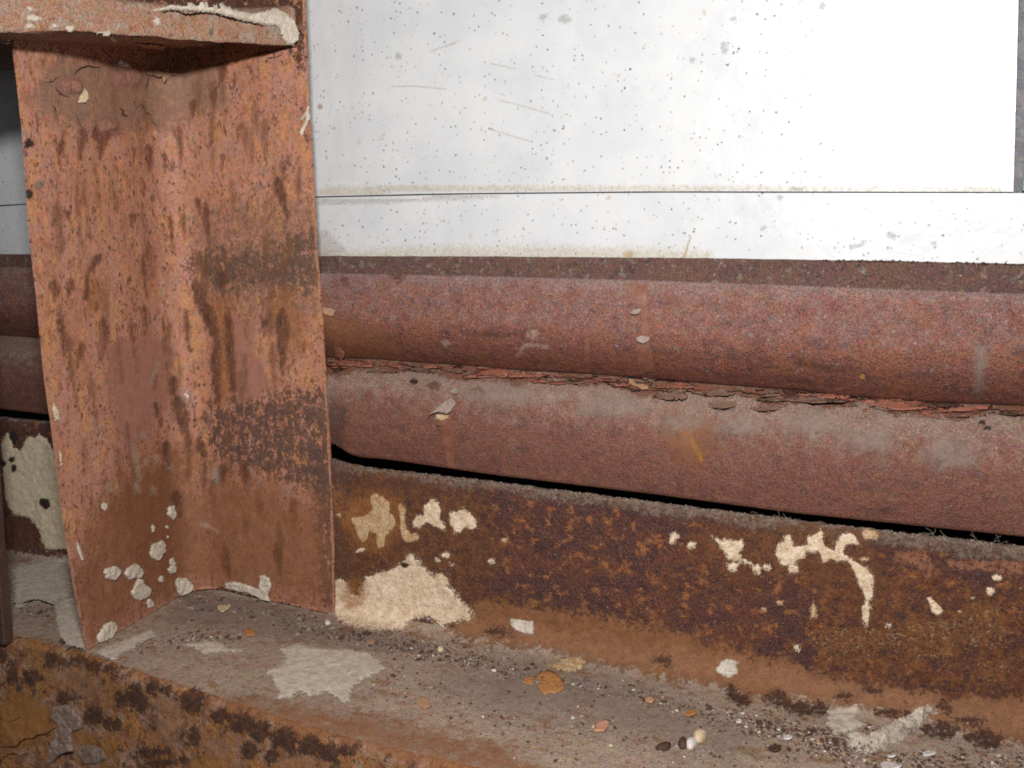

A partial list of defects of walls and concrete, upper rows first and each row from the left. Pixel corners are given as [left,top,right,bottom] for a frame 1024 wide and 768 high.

rust [79,127,111,159]
rust [274,176,300,216]
rust [52,254,101,300]
peeling [409,368,562,421]
peeling [807,392,928,411]
peeling [1,431,67,550]
rust [75,200,1024,753]
rust [3,511,40,552]
peeling [669,531,697,550]
peeling [332,493,477,644]
peeling [712,527,879,628]
rust [0,639,361,768]